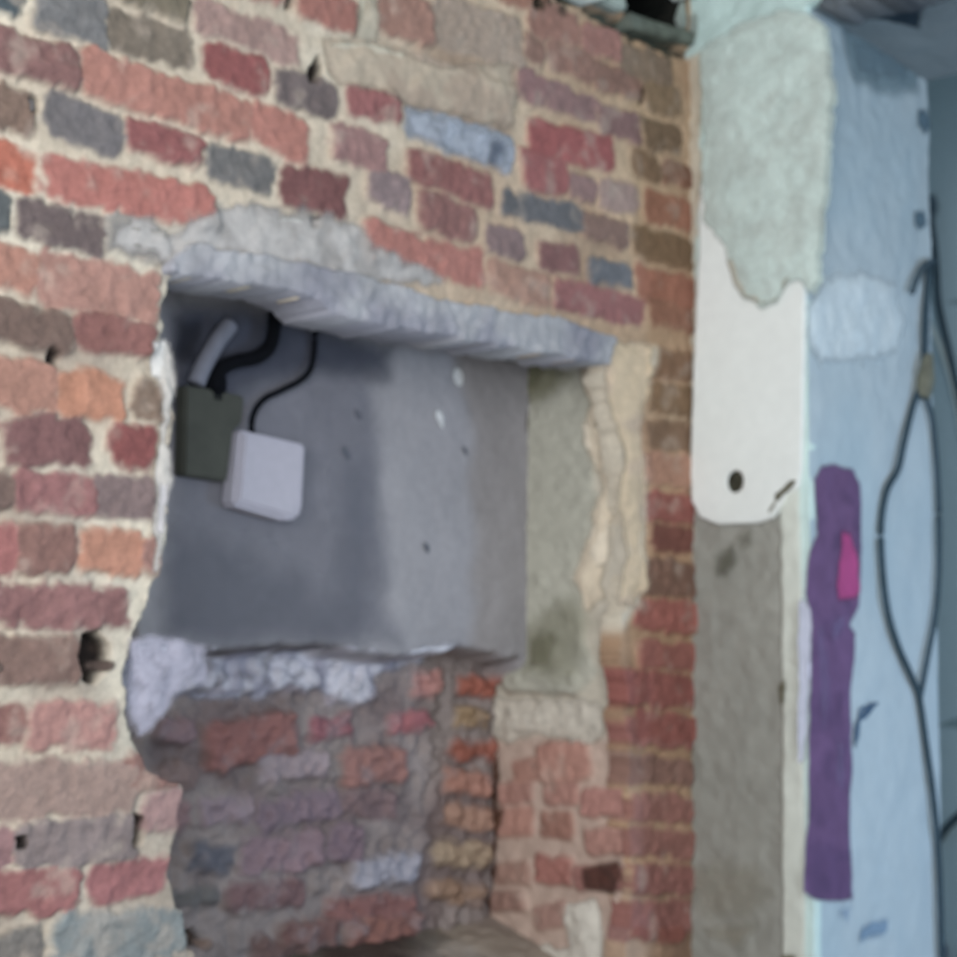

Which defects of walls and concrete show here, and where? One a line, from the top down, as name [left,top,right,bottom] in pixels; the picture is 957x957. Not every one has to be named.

peeling [589,521,609,566]
spalling [78,632,115,682]
peeling [398,645,455,660]
peeling [129,636,206,735]